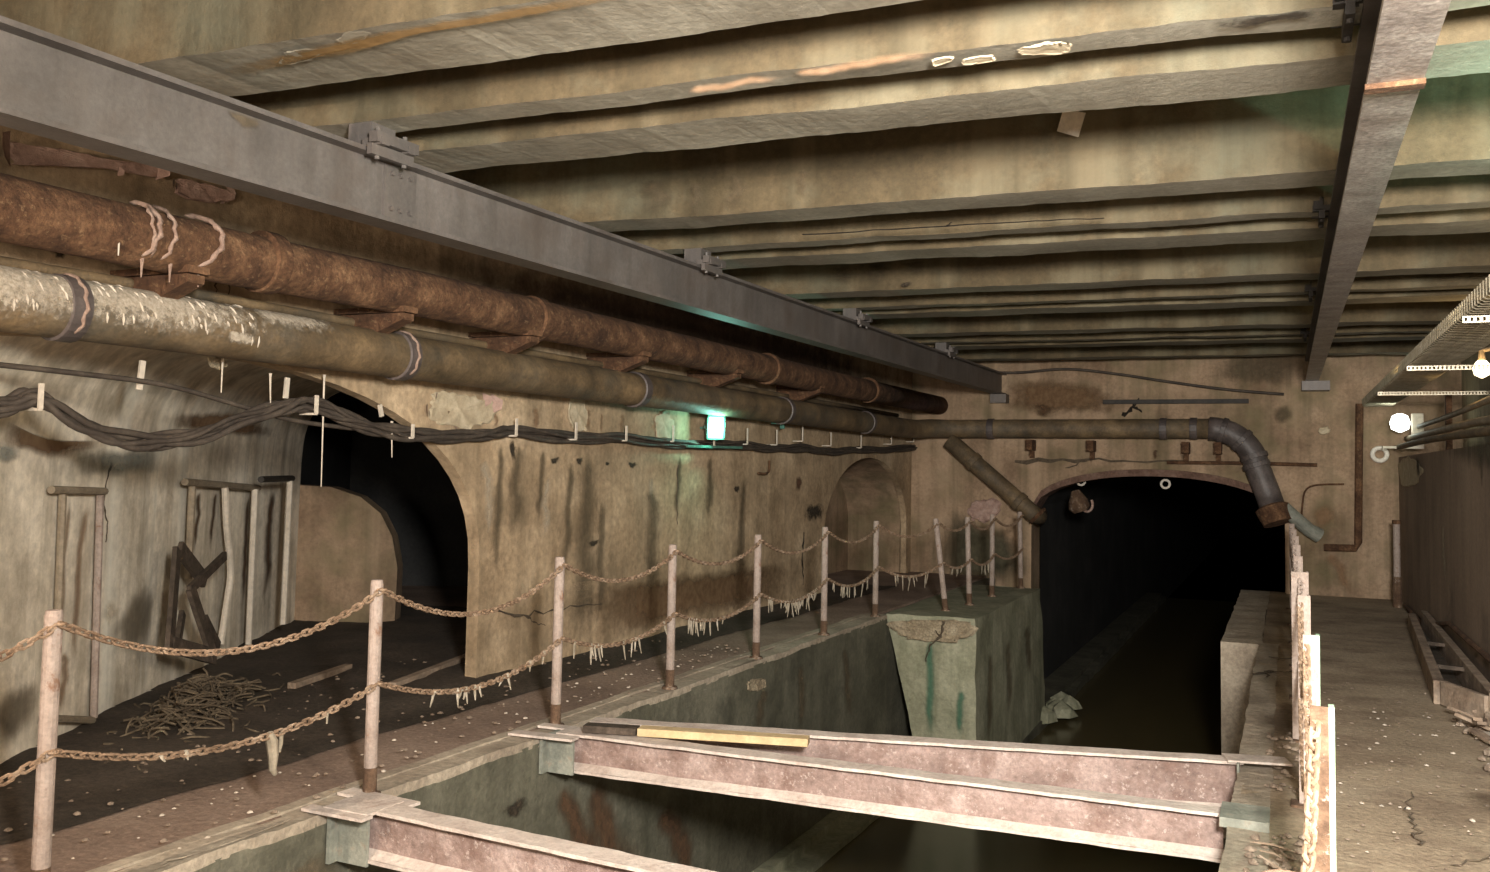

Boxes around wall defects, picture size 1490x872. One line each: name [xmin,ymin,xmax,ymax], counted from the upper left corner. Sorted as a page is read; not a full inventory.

peeling [1017,41,1073,55]
rust [802,57,902,73]
peeling [932,55,996,66]
rust [694,78,761,91]
damp [494,449,544,548]
damp [565,466,775,626]